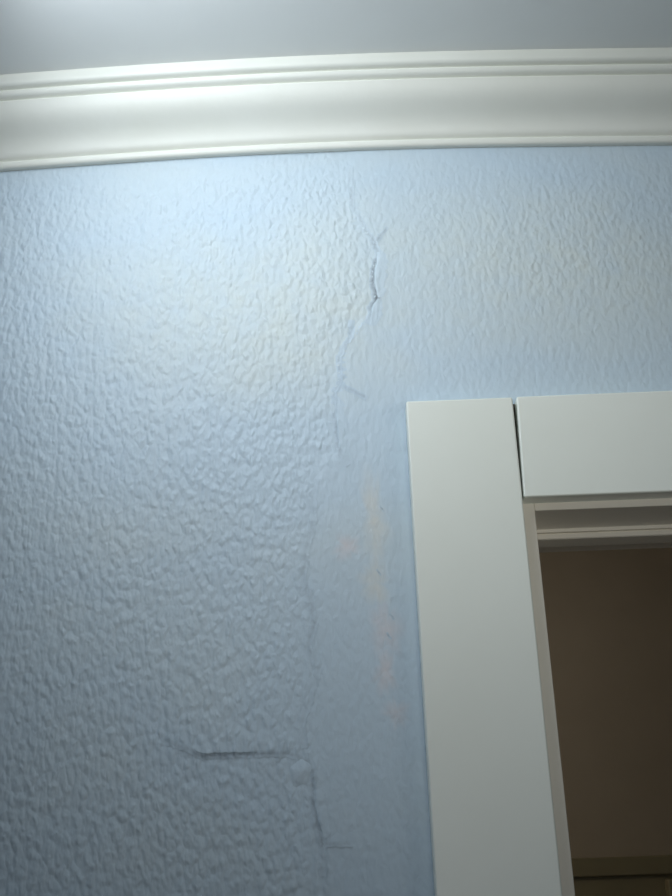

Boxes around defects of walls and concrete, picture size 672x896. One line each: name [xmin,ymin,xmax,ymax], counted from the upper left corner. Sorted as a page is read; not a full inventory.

crack [347,166,389,326]
crack [160,738,354,877]